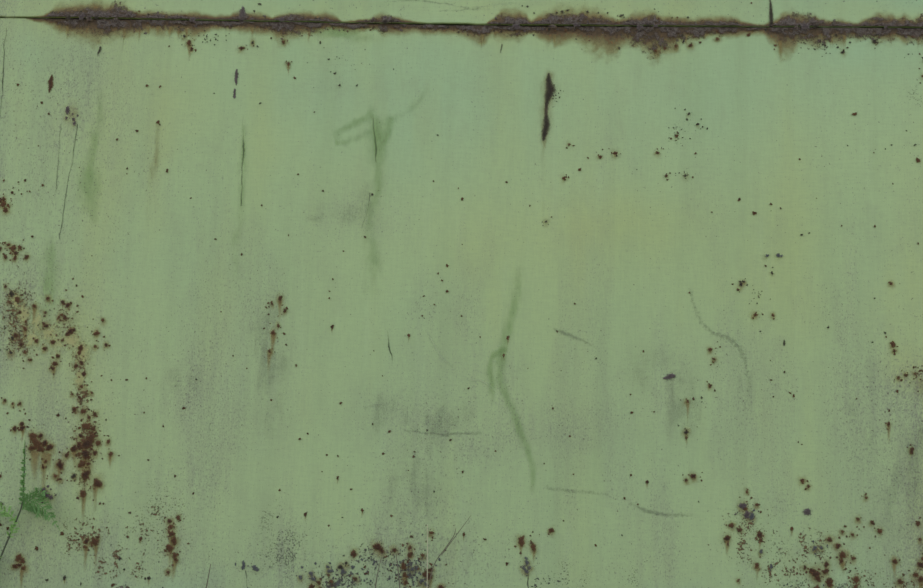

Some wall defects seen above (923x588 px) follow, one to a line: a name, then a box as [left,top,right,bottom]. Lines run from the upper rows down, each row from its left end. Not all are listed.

corrosion [28,1,923,84]
corrosion [263,296,288,361]
corrosion [0,235,120,509]
corrosion [12,554,26,581]
corrosion [158,516,189,576]
corrosion [296,531,449,588]
corrosion [724,488,764,570]
corrosion [783,518,883,588]
corrosion [884,554,923,588]